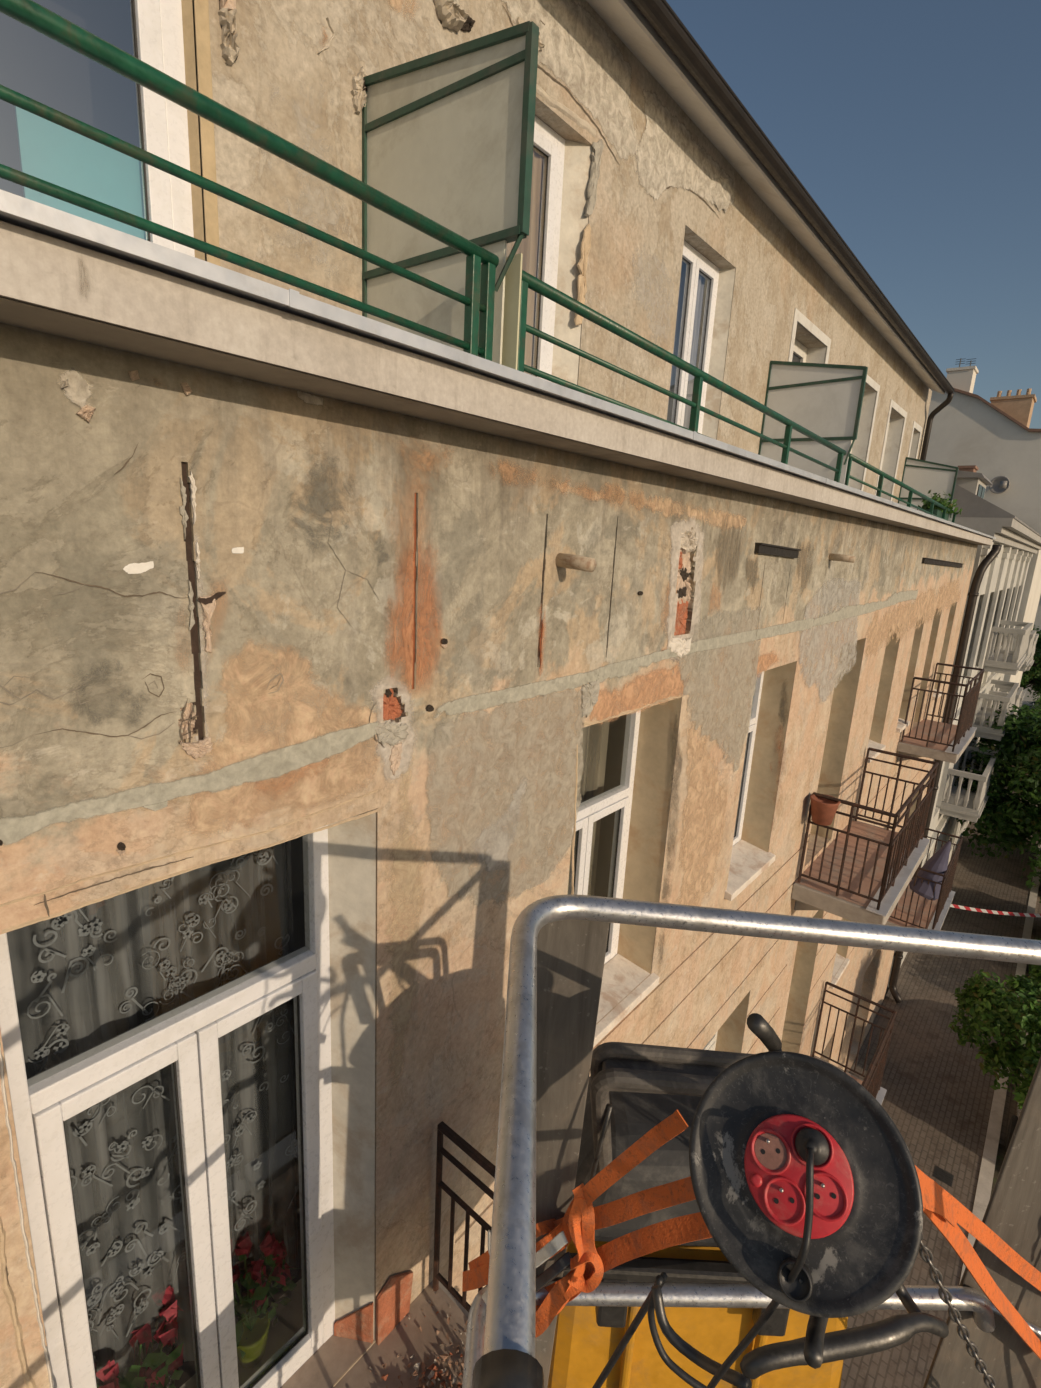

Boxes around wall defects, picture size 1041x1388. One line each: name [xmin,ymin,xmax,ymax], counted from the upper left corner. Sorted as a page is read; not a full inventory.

peeling [218,0,240,66]
peeling [433,0,475,32]
peeling [502,0,735,326]
crack [0,462,226,759]
crack [328,511,377,624]
rust [387,492,439,687]
spalling [580,483,747,723]
peeling [189,642,415,834]